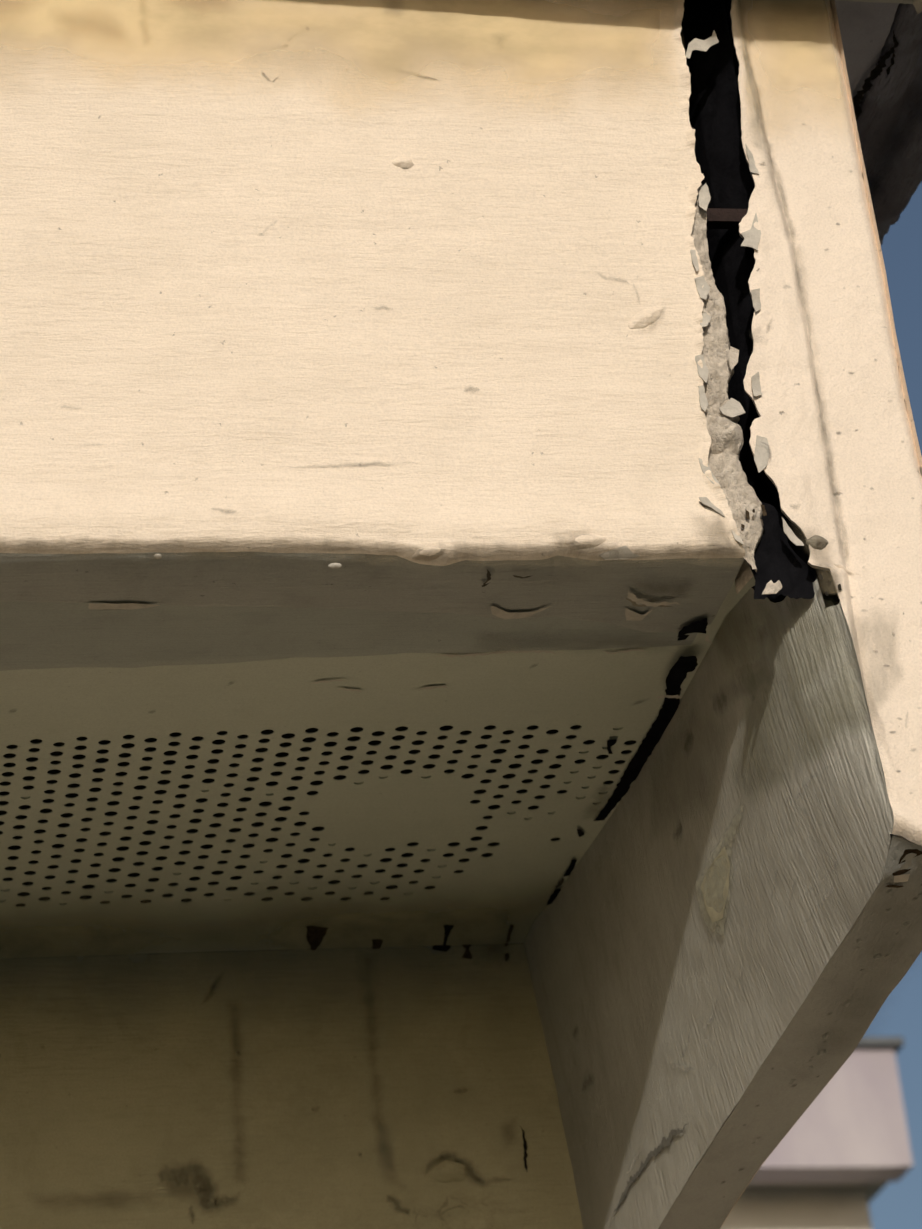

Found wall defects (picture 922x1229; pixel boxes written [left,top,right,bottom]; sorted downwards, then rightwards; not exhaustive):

damp [0,0,647,75]
crack [686,31,719,59]
crack [852,30,899,120]
peeling [746,145,759,175]
crack [706,208,761,250]
peeling [690,183,740,425]
peeling [751,288,761,312]
peeling [751,372,762,396]
crack [719,398,770,473]
peeling [699,441,767,594]
crack [750,502,842,599]
peeling [782,518,828,550]